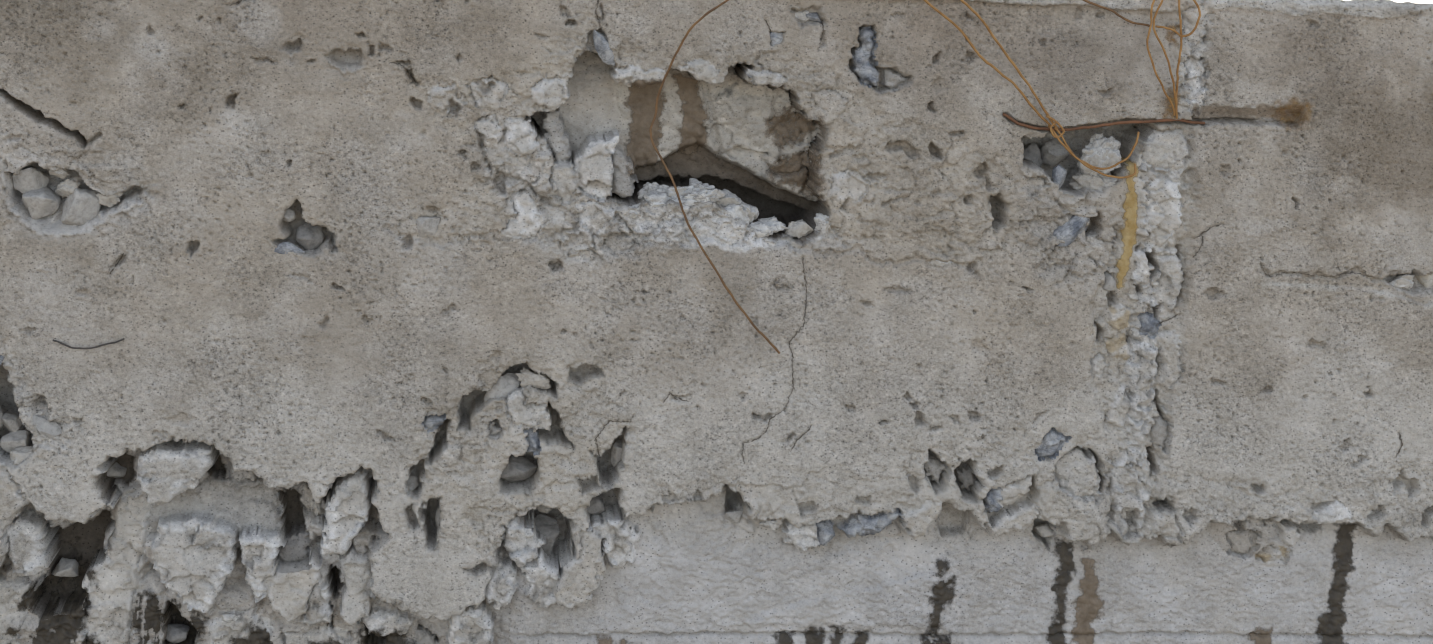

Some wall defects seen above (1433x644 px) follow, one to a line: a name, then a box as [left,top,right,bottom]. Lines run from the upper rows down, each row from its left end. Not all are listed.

crack [0,84,92,155]
spalling [428,1,871,259]
spalling [0,153,166,245]
rust [1116,157,1139,289]
spalling [1016,6,1310,455]
crack [741,262,812,463]
spalling [0,355,642,644]
spalling [716,420,1186,564]
leakage [920,559,955,644]
leakage [1047,539,1104,644]
leakage [1248,628,1273,644]
leakage [1316,523,1357,644]